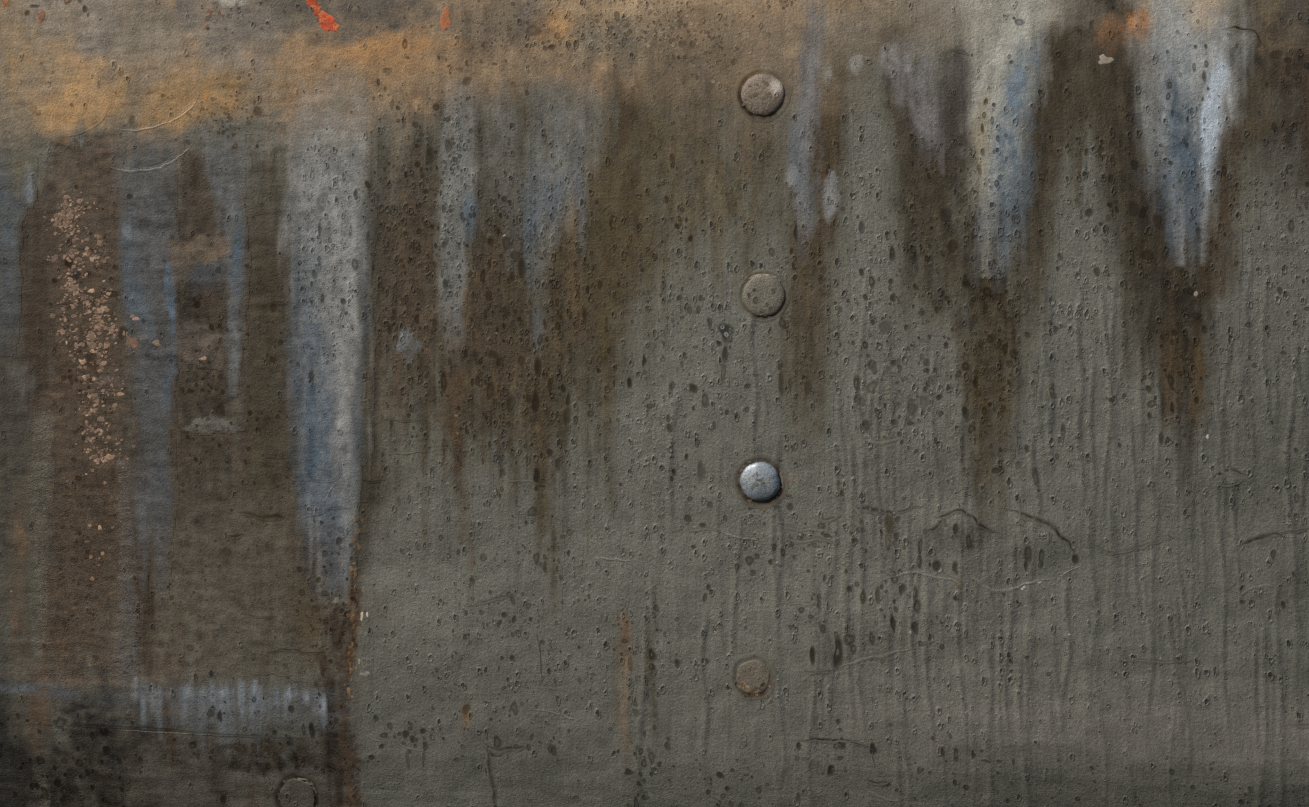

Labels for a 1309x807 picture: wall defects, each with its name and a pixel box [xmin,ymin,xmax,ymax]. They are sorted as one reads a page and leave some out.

rust [0,77,420,702]
water stain [0,0,648,623]
water stain [780,0,831,270]
rust [324,0,1309,617]
water stain [882,0,1259,295]